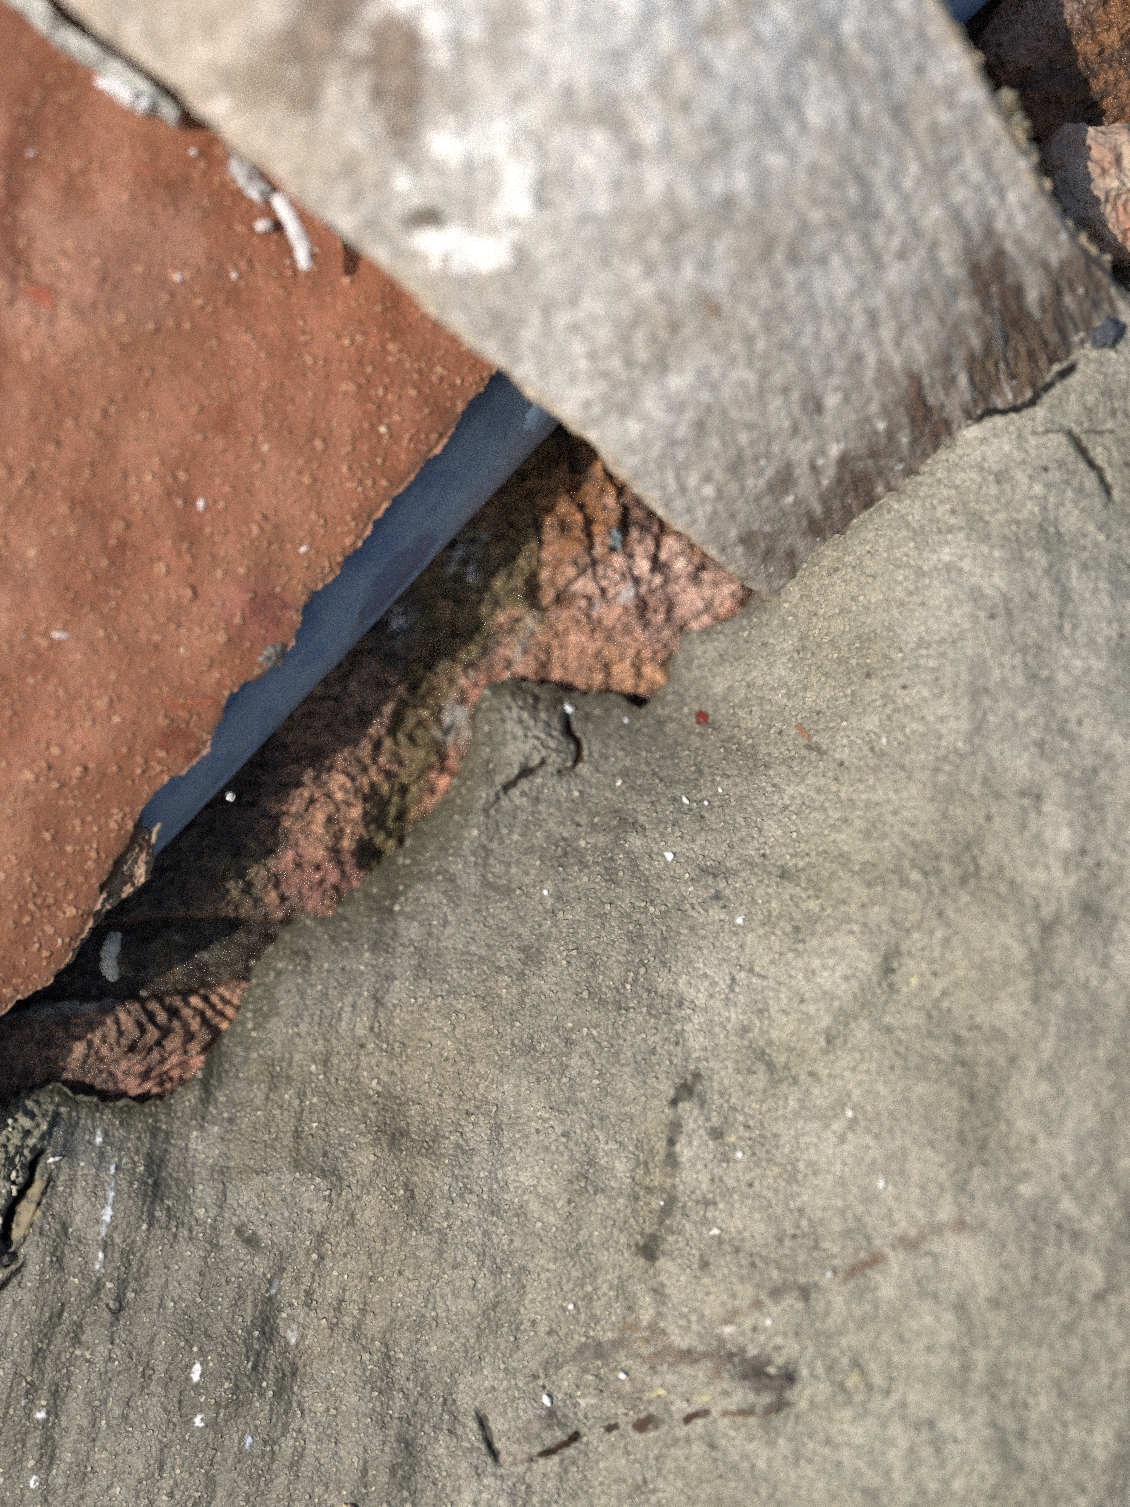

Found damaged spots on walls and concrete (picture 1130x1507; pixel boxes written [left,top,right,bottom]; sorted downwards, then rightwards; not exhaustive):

peeling [610,526,624,551]
spalling [53,819,155,980]
spalling [0,1089,63,1267]
spalling [106,1299,123,1314]
spalling [522,1323,797,1436]